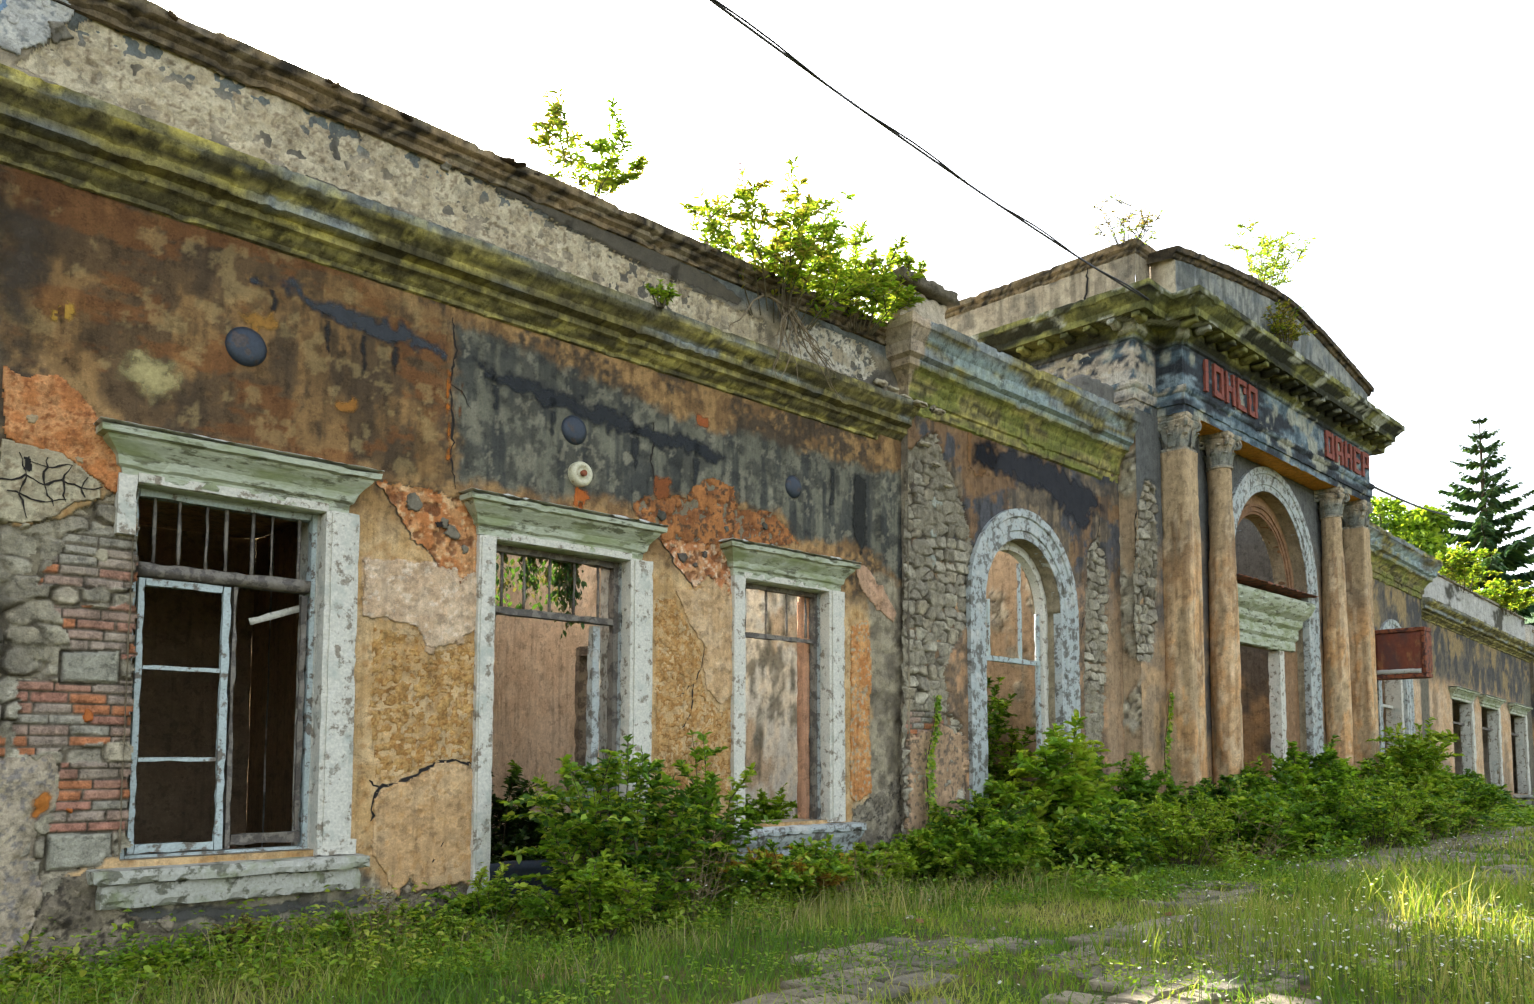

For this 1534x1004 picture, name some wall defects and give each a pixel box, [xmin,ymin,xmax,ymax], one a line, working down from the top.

damp [51,303,75,321]
damp [435,161,742,305]
crack [0,452,103,518]
flaking render [0,366,332,972]
peeling [353,479,477,924]
crack [369,759,472,821]
spalling [0,0,973,856]
flaking render [1083,536,1110,757]
flaking render [1133,480,1159,662]